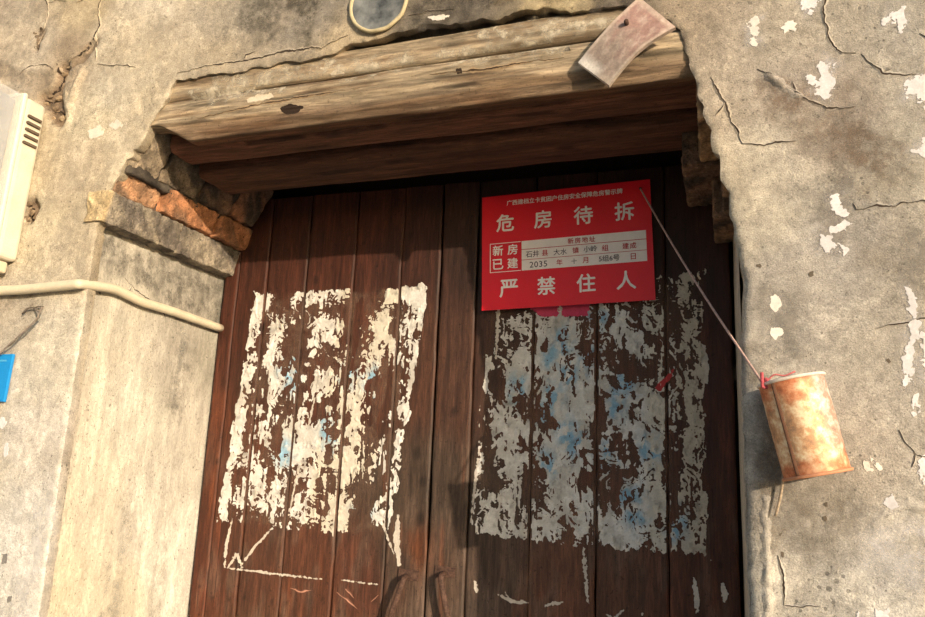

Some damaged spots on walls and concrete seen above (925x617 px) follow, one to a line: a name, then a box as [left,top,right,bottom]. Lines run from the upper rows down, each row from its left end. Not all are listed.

crack [19,0,136,75]
crack [710,77,795,147]
crack [757,69,855,112]
peeling [805,60,837,102]
peeling [899,73,925,110]
peeling [820,193,852,256]
crack [852,199,925,211]
crack [876,316,925,329]
peeling [886,286,925,417]
crack [899,430,925,467]
crack [777,555,820,608]